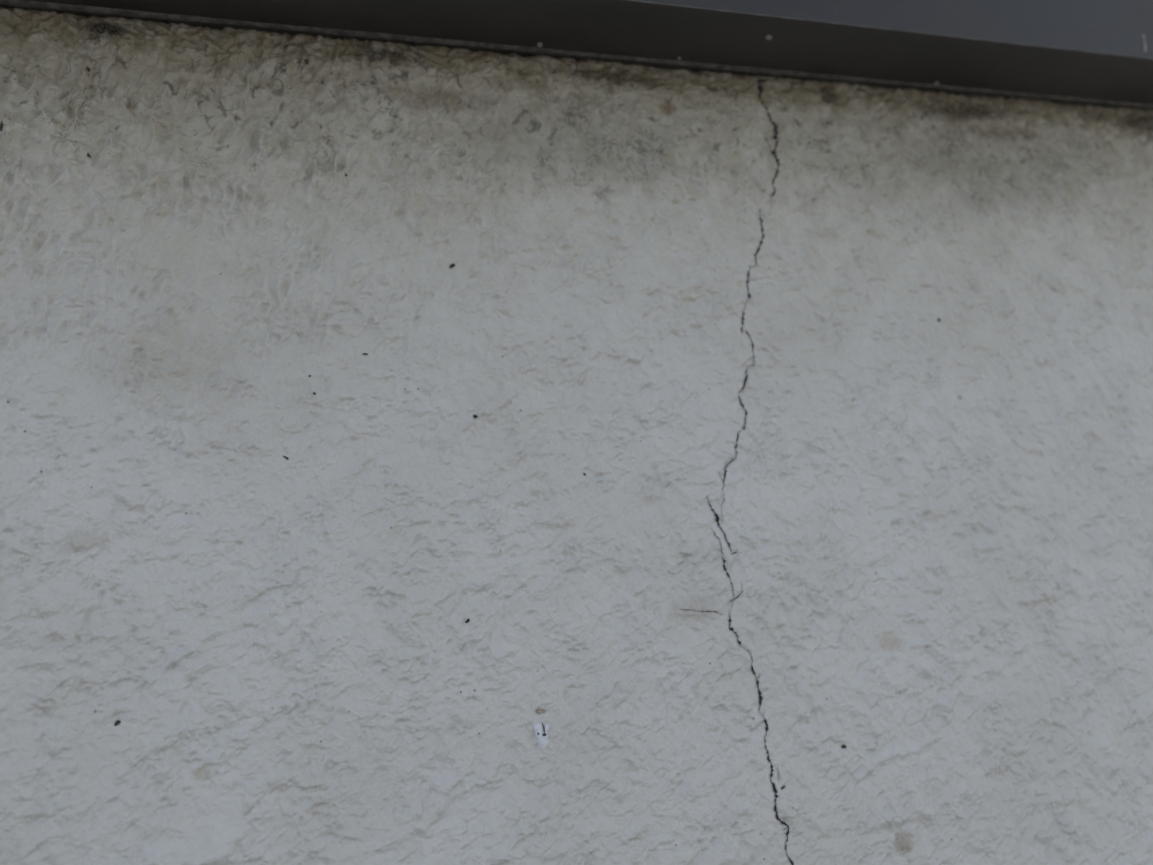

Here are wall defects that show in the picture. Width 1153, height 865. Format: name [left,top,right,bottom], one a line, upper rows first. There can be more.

crack [681,77,793,865]